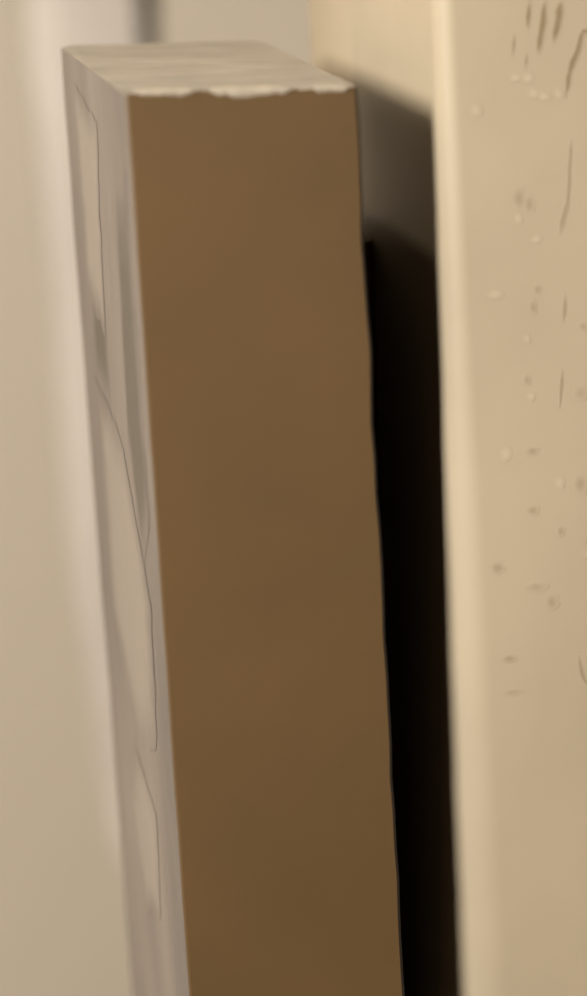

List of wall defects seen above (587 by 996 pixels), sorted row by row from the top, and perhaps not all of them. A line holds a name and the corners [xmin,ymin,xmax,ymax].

crack [511,0,587,99]
crack [558,139,572,235]
crack [557,369,565,409]